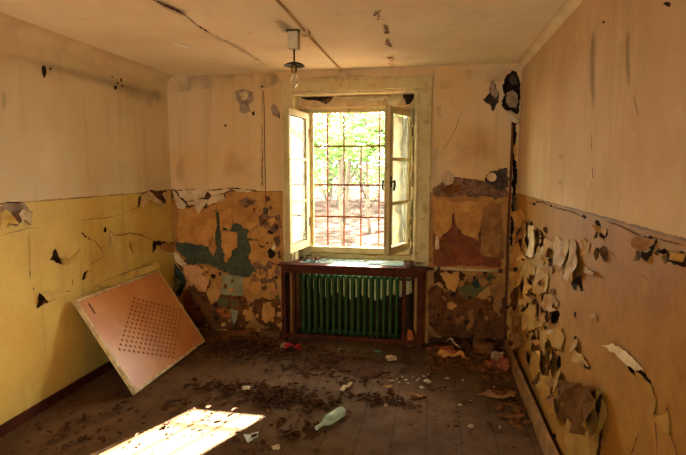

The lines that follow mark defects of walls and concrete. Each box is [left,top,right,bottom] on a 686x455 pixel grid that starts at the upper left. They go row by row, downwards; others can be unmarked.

crack [154,0,264,64]
spalling [235,89,255,116]
spalling [483,71,521,114]
peeling [0,202,33,230]
peeling [50,248,81,265]
peeling [137,188,282,332]
peeling [37,291,72,309]
peeling [427,123,686,455]